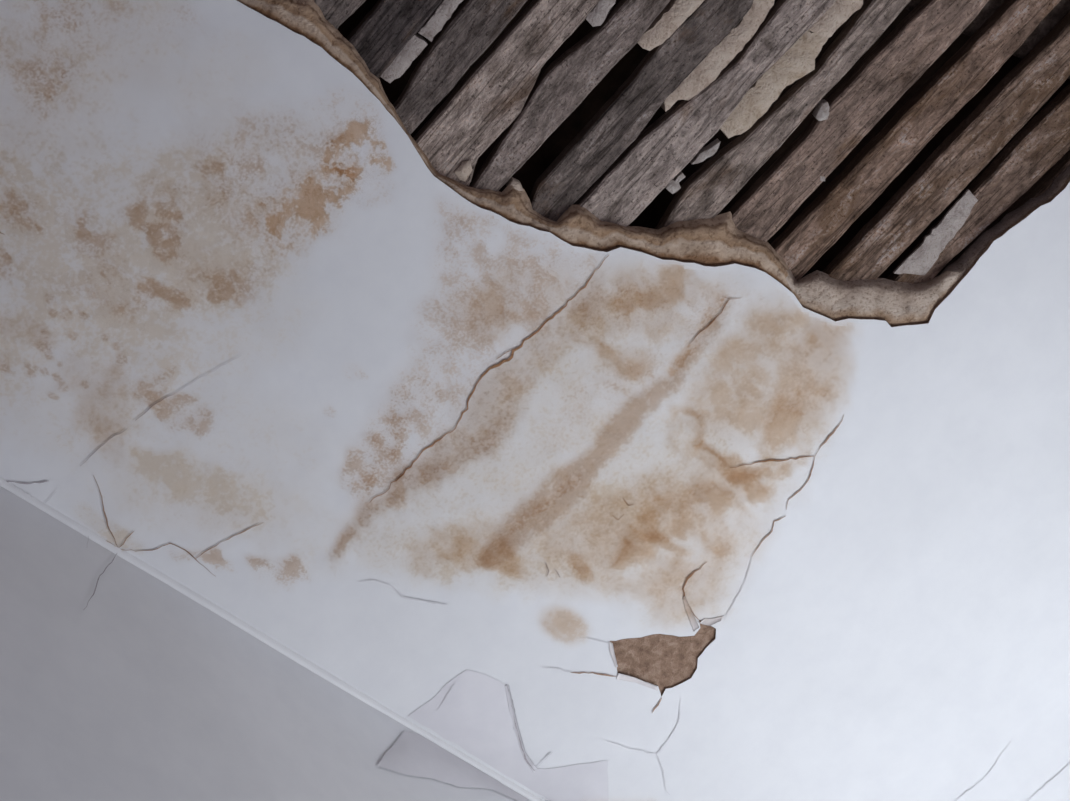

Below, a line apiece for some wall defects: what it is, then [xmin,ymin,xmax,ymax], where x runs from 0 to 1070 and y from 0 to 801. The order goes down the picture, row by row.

spalling [239,0,1070,325]
crack [370,255,609,502]
crack [692,296,742,341]
crack [84,356,262,607]
crack [724,415,844,620]
crack [358,580,446,605]
crack [549,667,617,677]
spalling [609,562,724,695]
crack [608,698,681,795]